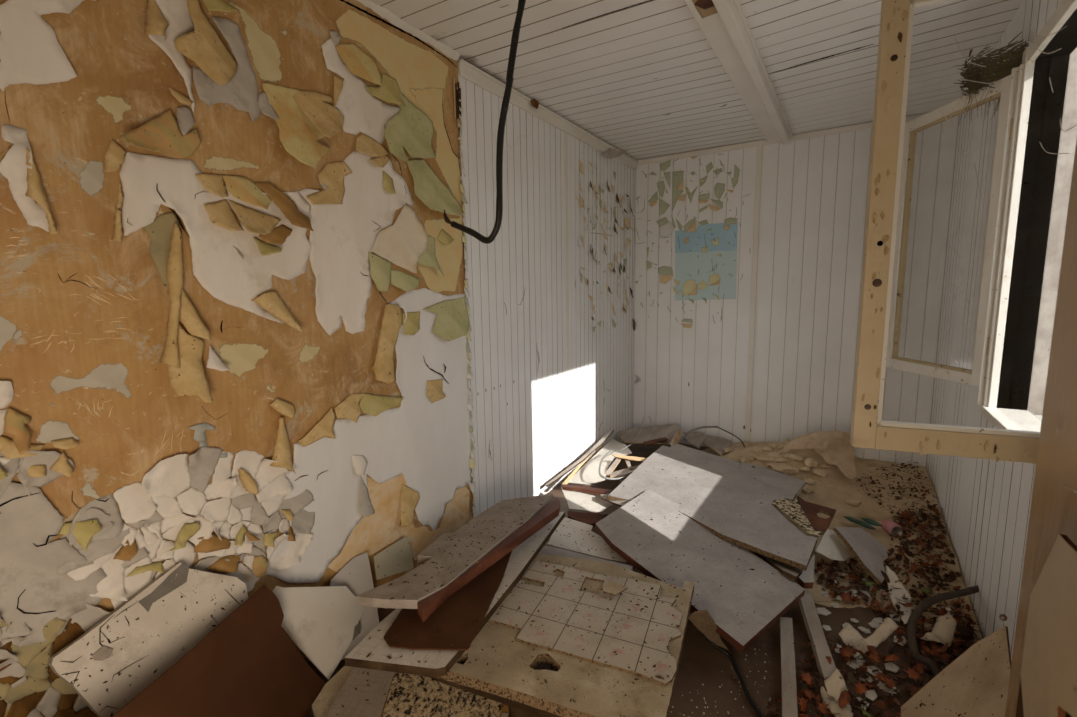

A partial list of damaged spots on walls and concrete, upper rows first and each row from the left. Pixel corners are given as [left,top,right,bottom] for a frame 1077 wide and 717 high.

peeling [575,159,740,333]
peeling [0,423,315,717]